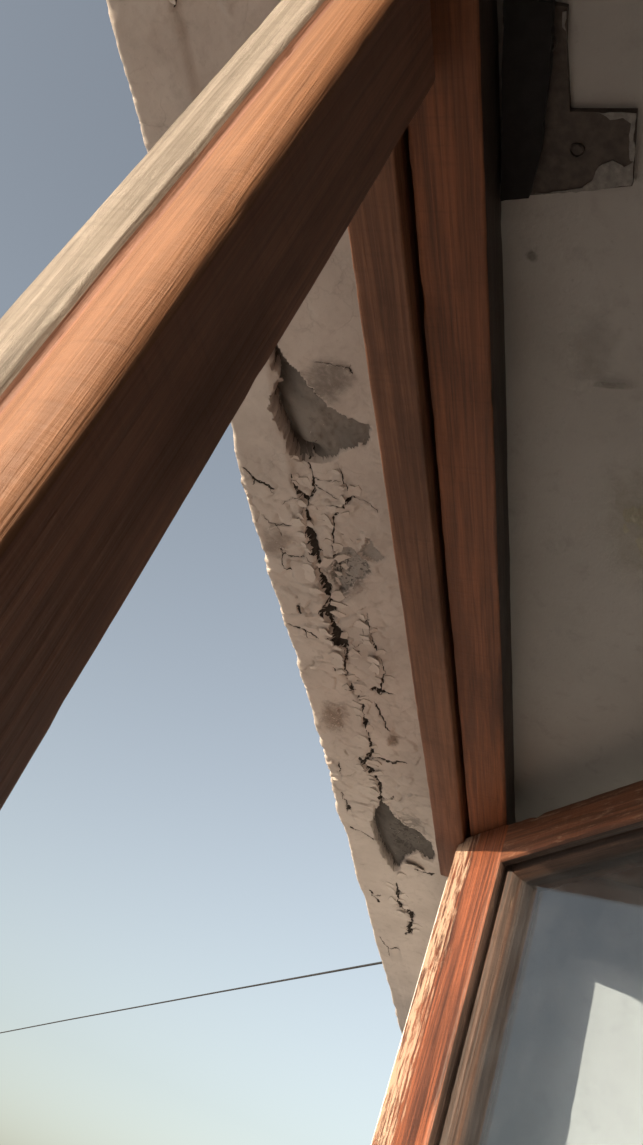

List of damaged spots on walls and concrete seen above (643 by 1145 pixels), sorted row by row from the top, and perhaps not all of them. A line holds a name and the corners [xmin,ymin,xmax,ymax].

spalling [273,344,370,461]
crack [243,440,407,839]
spalling [374,799,435,877]
crack [369,869,435,956]